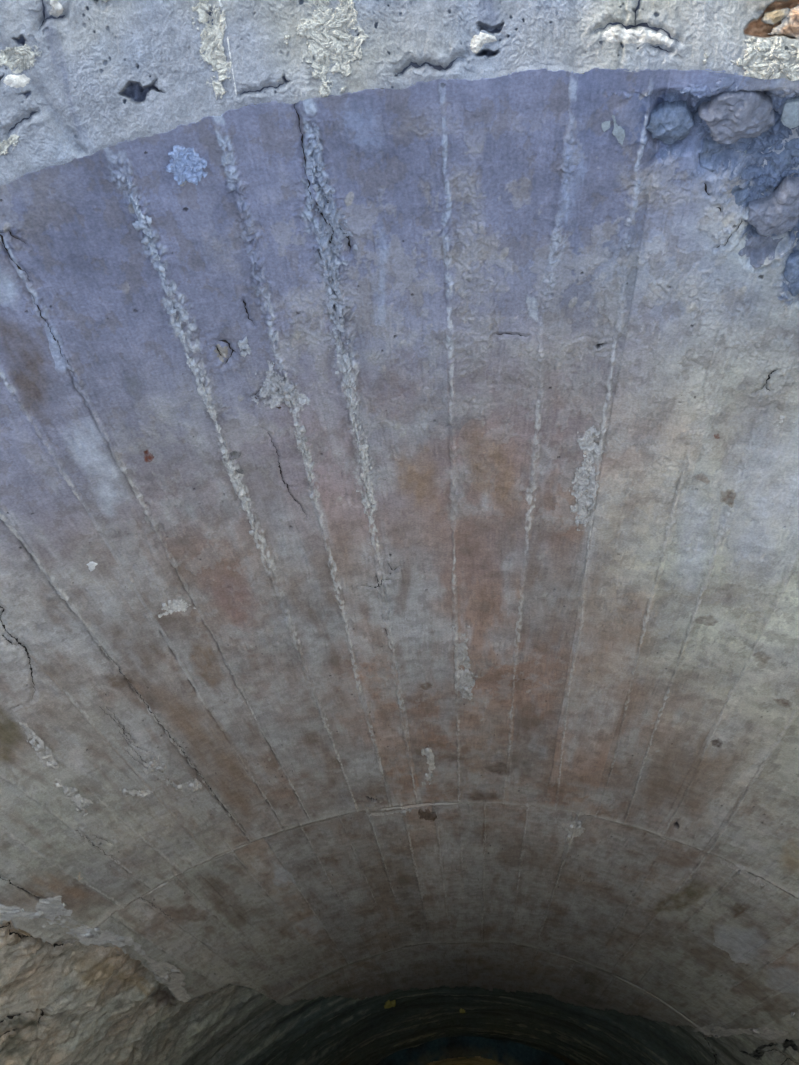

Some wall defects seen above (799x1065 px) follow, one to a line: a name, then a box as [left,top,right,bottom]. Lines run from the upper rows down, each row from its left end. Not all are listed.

spalling [162,137,208,188]
crack [0,231,72,372]
rust [143,449,154,463]
crack [268,433,307,516]
crack [0,606,36,708]
leakage [0,701,32,775]
spalling [419,744,436,785]
peeling [0,895,191,1002]
crack [0,999,58,1037]